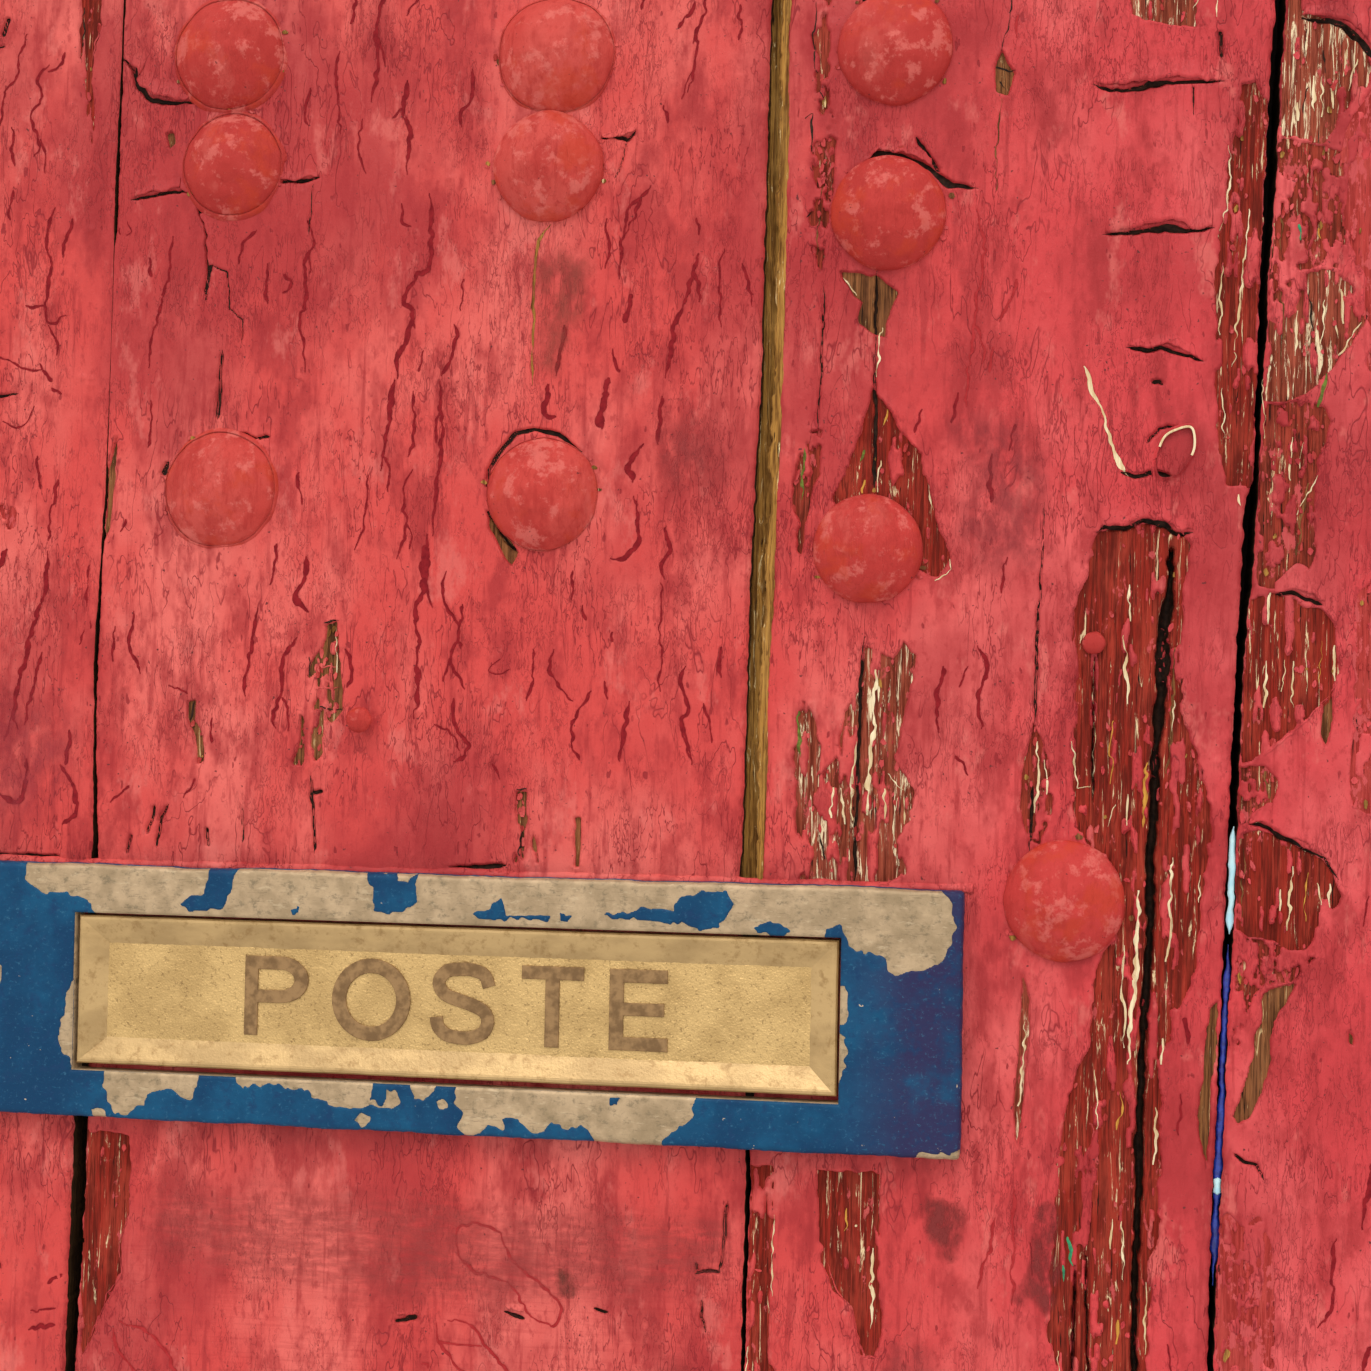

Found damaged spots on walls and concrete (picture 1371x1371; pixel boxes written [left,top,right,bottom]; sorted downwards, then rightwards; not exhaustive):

crack [1093,32,1223,114]
crack [0,456,195,856]
crack [119,169,320,475]
crack [242,543,309,731]
peeling [25,643,957,976]
crack [304,0,753,779]
peeling [833,272,951,581]
peeling [1047,524,1212,1371]
crack [1083,366,1193,536]
peeling [1197,0,1371,1160]
peeling [81,1071,199,1355]
peeling [817,1170,882,1360]